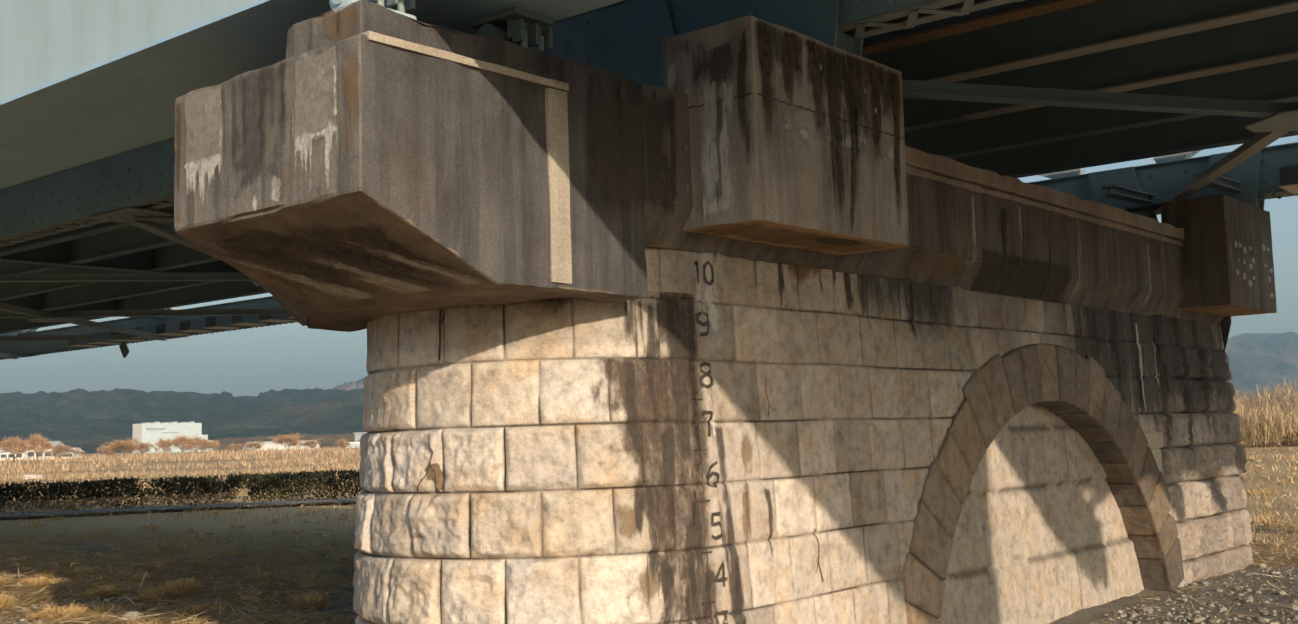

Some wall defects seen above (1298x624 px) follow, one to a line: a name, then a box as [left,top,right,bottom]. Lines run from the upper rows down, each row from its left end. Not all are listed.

leakage [232,65,286,211]
leakage [591,22,901,229]
leakage [844,272,949,334]
leakage [969,194,1233,449]
crack [417,443,436,491]
leakage [596,292,746,624]